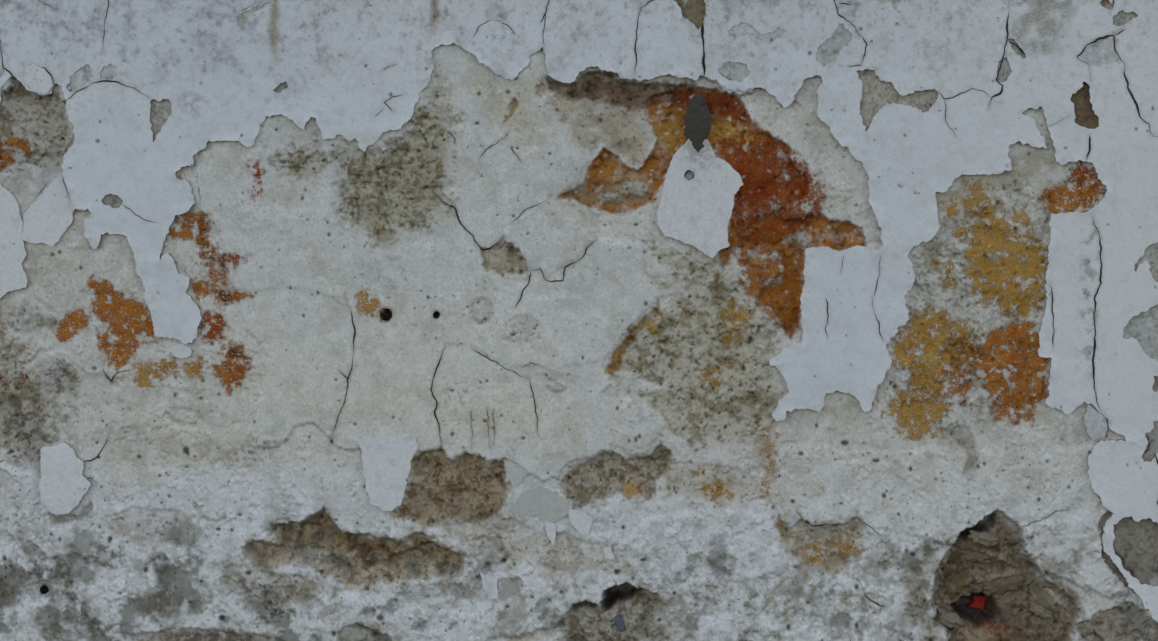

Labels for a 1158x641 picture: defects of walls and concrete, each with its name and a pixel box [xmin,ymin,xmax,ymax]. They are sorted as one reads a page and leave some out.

crack [42,67,147,100]
crack [634,0,653,76]
spalling [674,0,706,30]
crack [699,23,707,74]
crack [834,0,867,67]
crack [940,15,1026,139]
crack [1077,0,1153,135]
spalling [0,38,1108,545]
spalling [242,507,472,591]
spalling [558,583,666,641]
spalling [928,509,1141,641]
spalling [1102,516,1158,587]